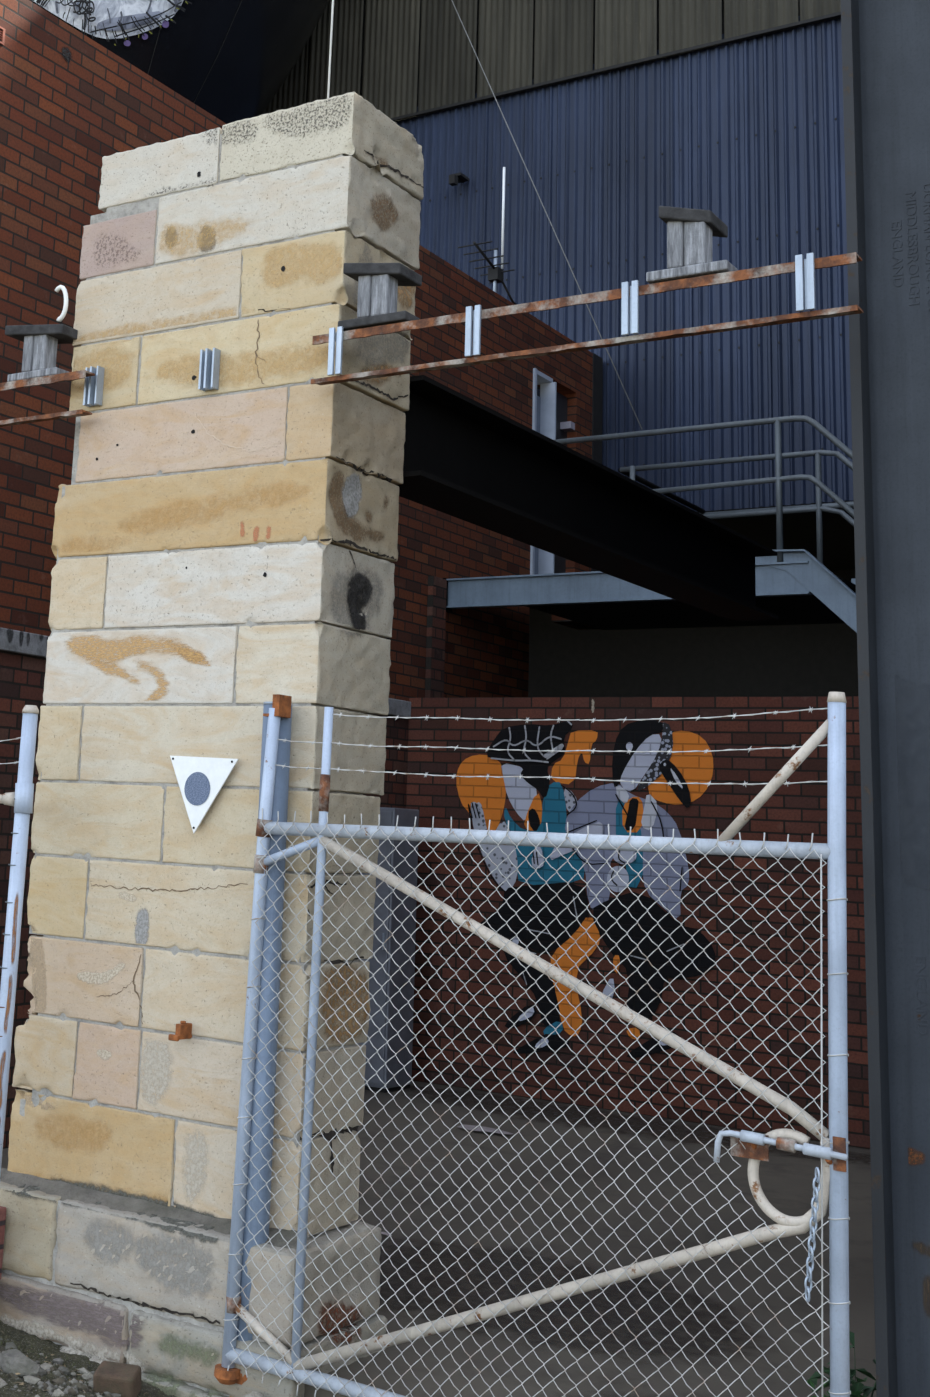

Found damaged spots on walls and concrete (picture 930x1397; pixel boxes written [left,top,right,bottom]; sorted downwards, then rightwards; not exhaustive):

crack [364,150,424,188]
crack [91,883,248,892]
crack [99,955,143,1024]